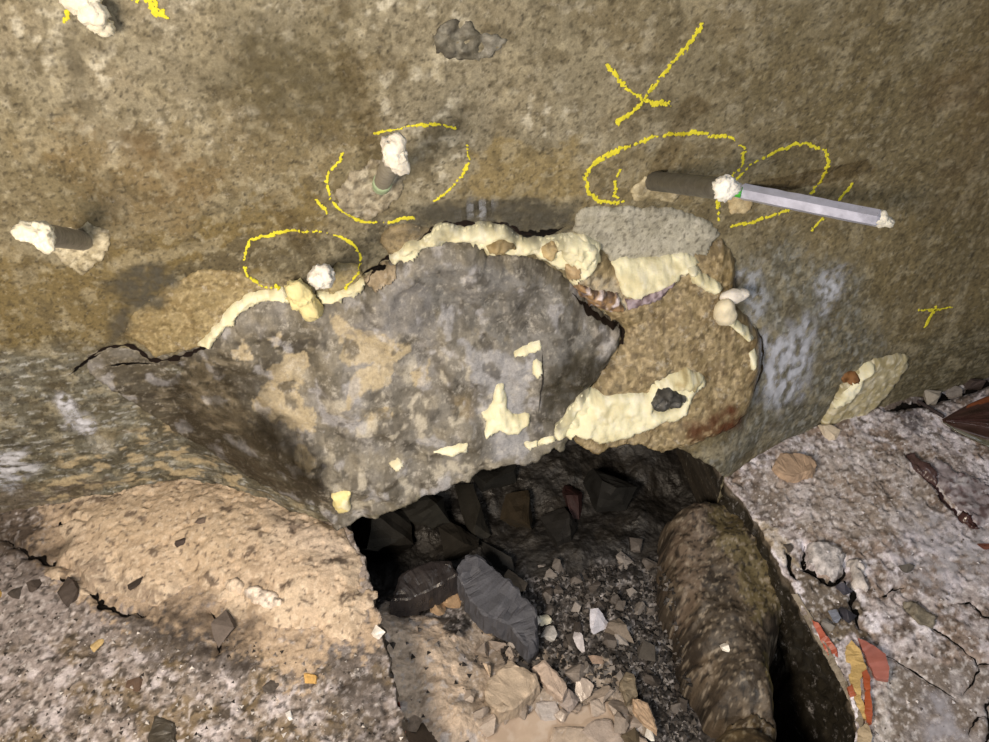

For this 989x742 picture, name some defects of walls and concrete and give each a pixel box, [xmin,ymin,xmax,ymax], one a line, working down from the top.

peeling [328,223,431,294]
peeling [124,269,274,358]
spalling [565,264,625,312]
leakage [740,272,764,316]
leakage [820,275,839,312]
crack [71,343,206,374]
peeling [655,367,704,393]
leakage [764,319,811,402]
crack [5,540,65,582]
crack [89,593,146,618]
crack [786,546,859,630]
crack [886,628,989,742]